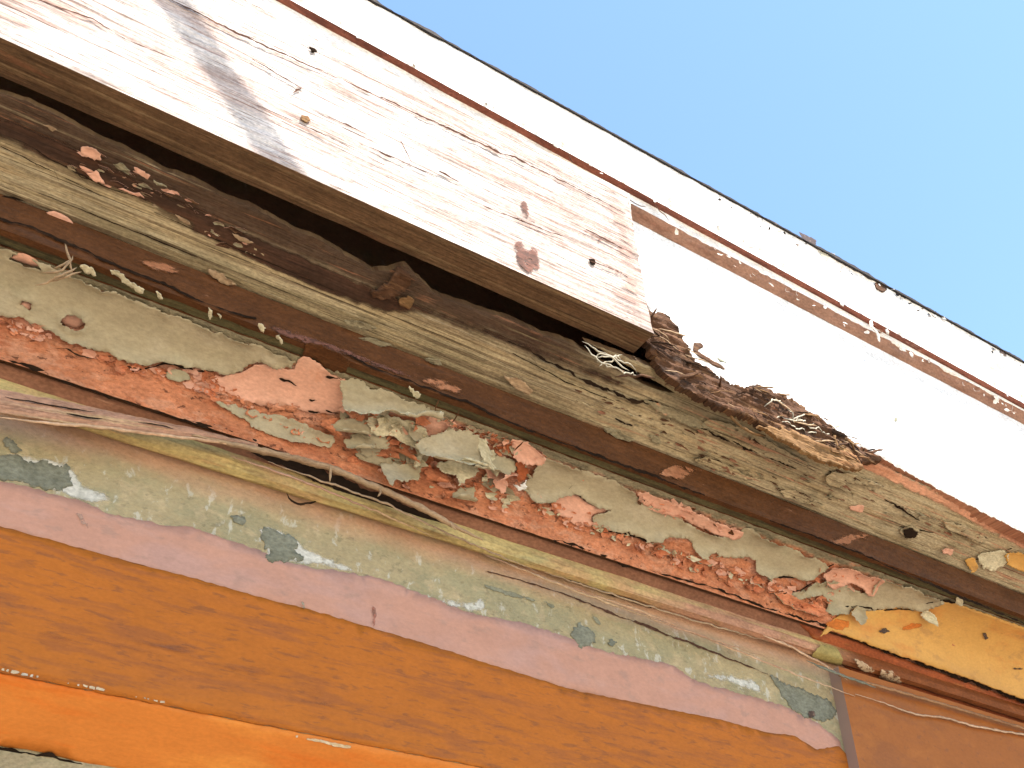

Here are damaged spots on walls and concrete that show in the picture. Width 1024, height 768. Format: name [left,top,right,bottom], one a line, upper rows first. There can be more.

peeling [647,194,697,235]
peeling [717,195,864,284]
crack [1,357,257,442]
peeling [947,358,1024,414]
peeling [0,249,988,627]
peeling [570,616,617,649]
peeling [770,675,837,722]